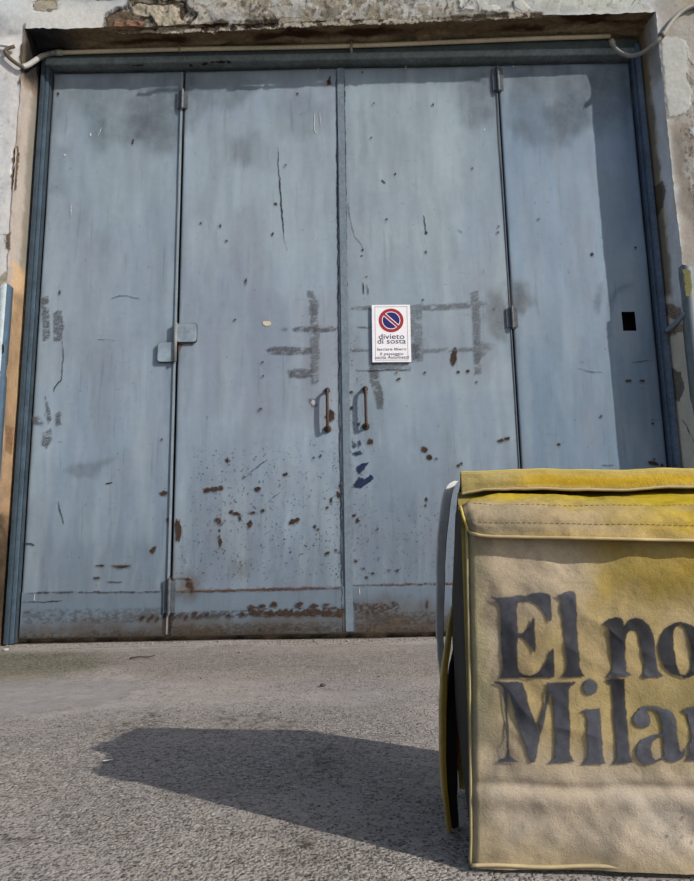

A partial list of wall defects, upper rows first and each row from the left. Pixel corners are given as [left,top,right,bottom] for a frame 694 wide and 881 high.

peeling [104,0,543,34]
rust [140,613,174,637]